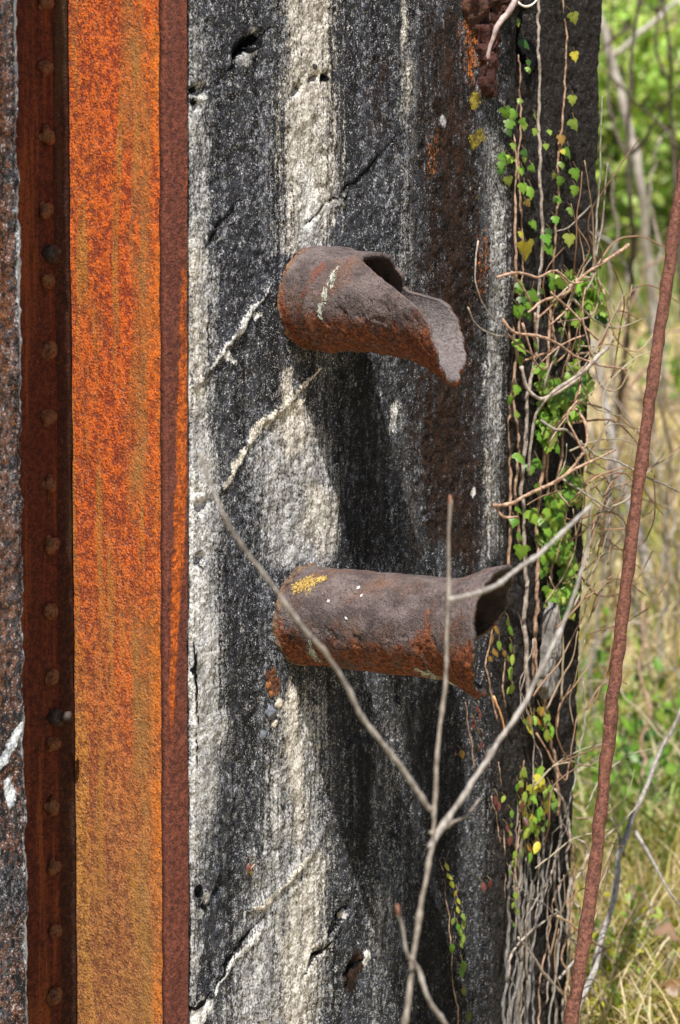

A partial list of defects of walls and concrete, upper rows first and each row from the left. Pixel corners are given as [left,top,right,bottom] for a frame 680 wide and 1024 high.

spalling [230,26,263,67]
crack [205,199,243,250]
crack [306,130,410,230]
corrosion [398,0,495,574]
crack [189,915,265,1011]